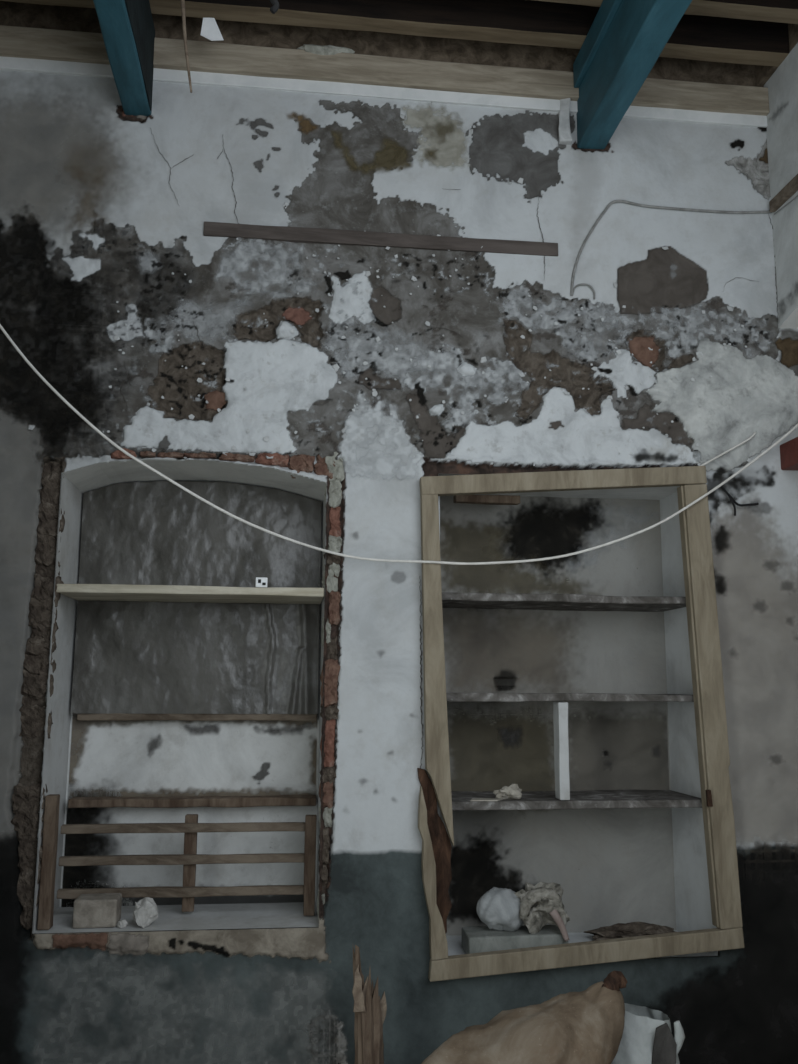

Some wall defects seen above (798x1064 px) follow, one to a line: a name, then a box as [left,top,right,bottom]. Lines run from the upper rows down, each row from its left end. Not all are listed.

spalling [116,105,153,123]
crack [150,128,238,222]
peeling [239,118,281,172]
peeling [273,100,465,238]
peeling [466,98,613,203]
spalling [725,127,770,199]
damp [0,103,181,1064]
peeling [0,210,798,962]
damp [648,845,798,1064]